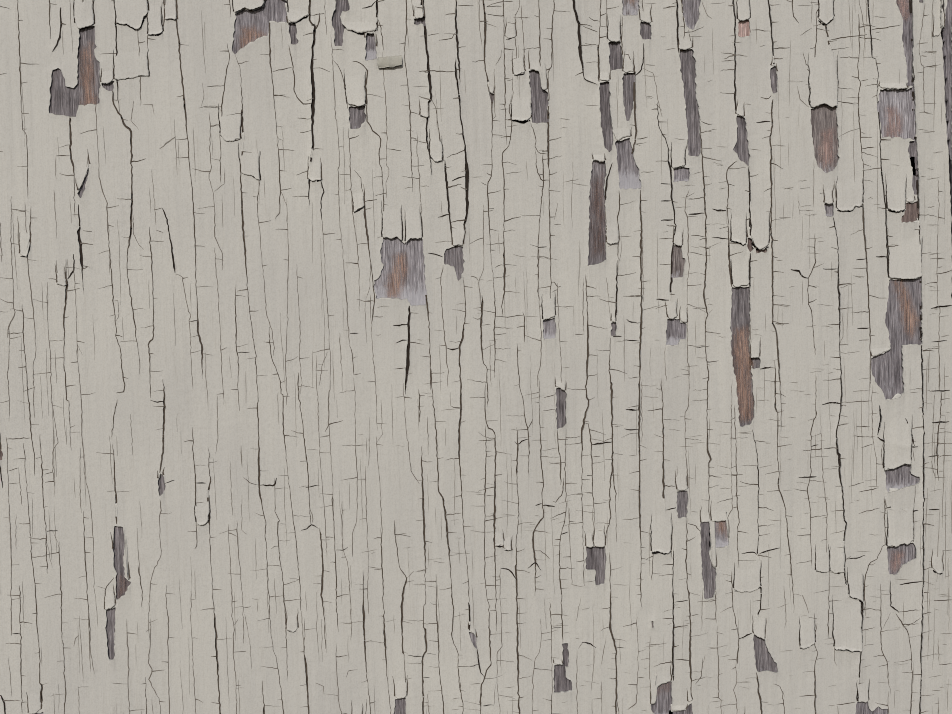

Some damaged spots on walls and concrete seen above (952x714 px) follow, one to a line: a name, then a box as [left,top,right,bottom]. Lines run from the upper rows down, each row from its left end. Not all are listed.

crack [0,0,28,188]
crack [49,0,118,56]
peeling [49,0,150,117]
peeling [232,0,310,54]
peeling [588,0,653,266]
peeling [670,0,701,182]
peeling [808,0,864,217]
peeling [871,0,923,399]
crack [899,0,942,139]
crack [0,117,113,714]
peeling [730,261,761,427]
crack [829,163,952,714]